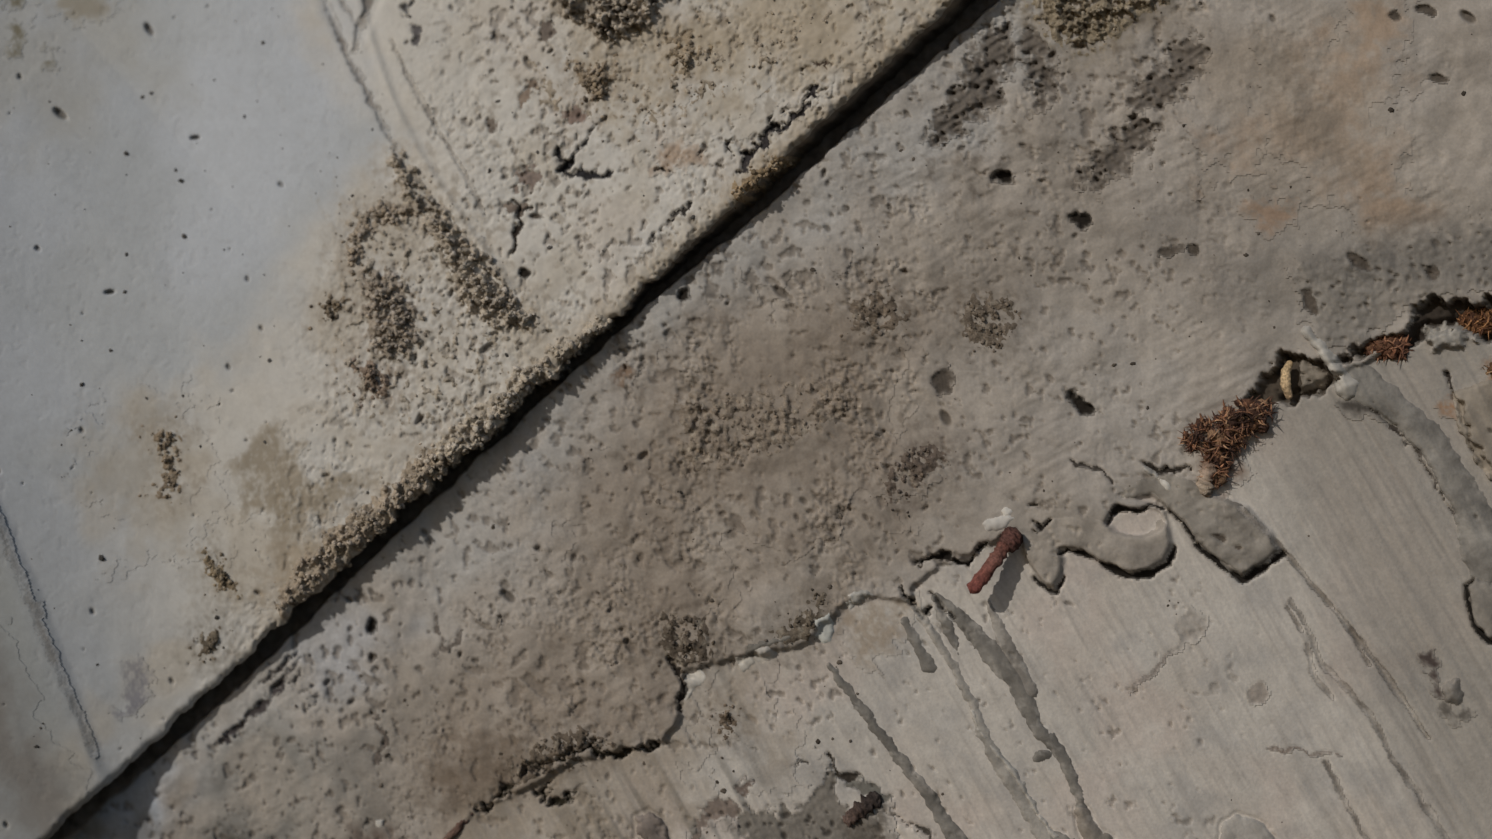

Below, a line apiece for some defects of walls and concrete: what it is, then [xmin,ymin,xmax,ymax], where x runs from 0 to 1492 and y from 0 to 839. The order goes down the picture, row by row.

crack [555,126,614,182]
spalling [953,291,1021,364]
spalling [1244,223,1492,411]
spalling [870,442,956,513]
peeling [982,507,1014,532]
crack [667,657,687,713]
crack [474,738,661,814]
flaking render [691,763,893,839]
crack [793,752,862,784]
peeling [896,823,923,839]